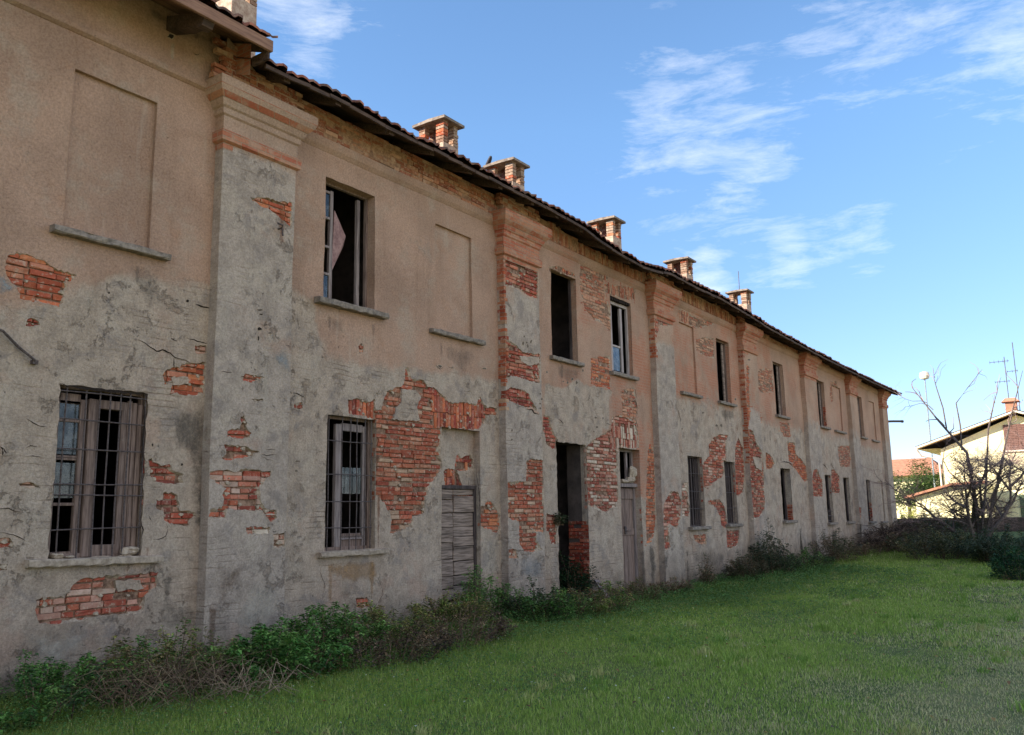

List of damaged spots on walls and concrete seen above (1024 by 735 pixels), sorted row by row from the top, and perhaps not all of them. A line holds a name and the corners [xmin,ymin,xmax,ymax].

flaking render [251,197,293,228]
flaking render [5,252,76,307]
crack [134,337,207,367]
flaking render [163,345,207,396]
flaking render [143,416,285,549]
flaking render [348,335,558,534]
flaking render [478,459,557,559]
flaking render [563,356,775,550]
flaking render [779,422,851,497]
flaking render [35,572,159,625]